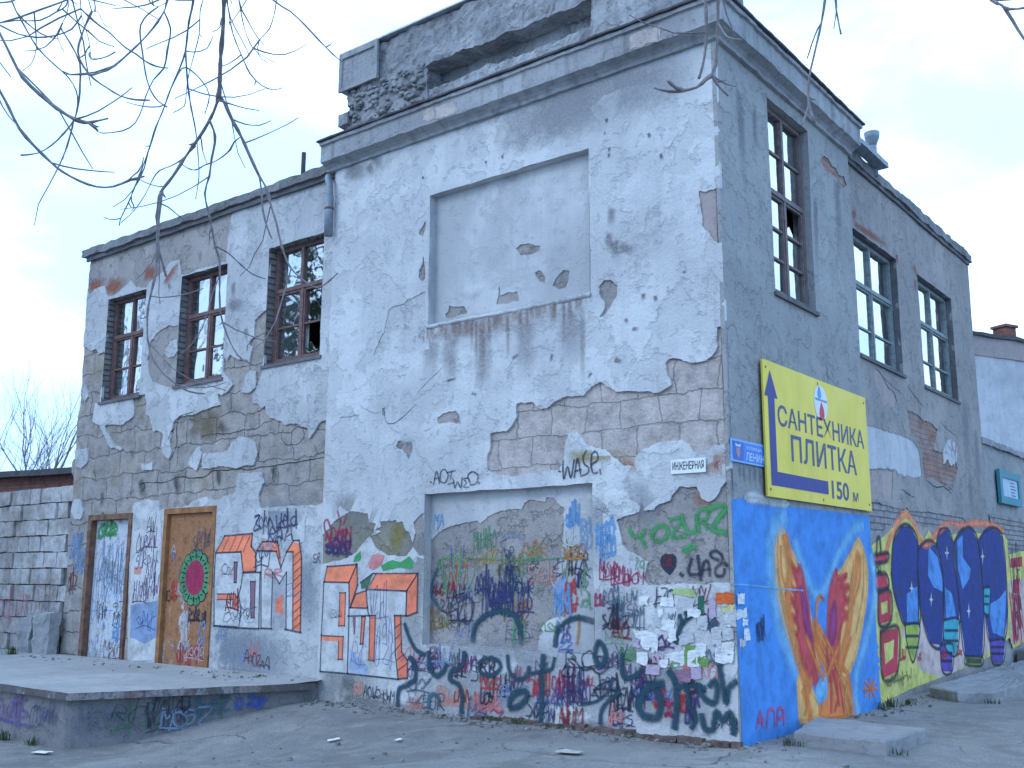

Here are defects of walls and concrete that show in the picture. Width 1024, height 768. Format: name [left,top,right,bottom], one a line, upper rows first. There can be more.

flaking render [821,156,845,187]
flaking render [88,213,232,296]
flaking render [517,244,540,255]
flaking render [536,270,569,289]
flaking render [600,280,617,317]
flaking render [699,189,719,243]
flaking render [438,411,461,424]
flaking render [488,327,730,477]
flaking render [60,312,326,656]
peeling [867,411,966,535]
flaking render [618,469,732,585]
flaking render [322,497,567,649]